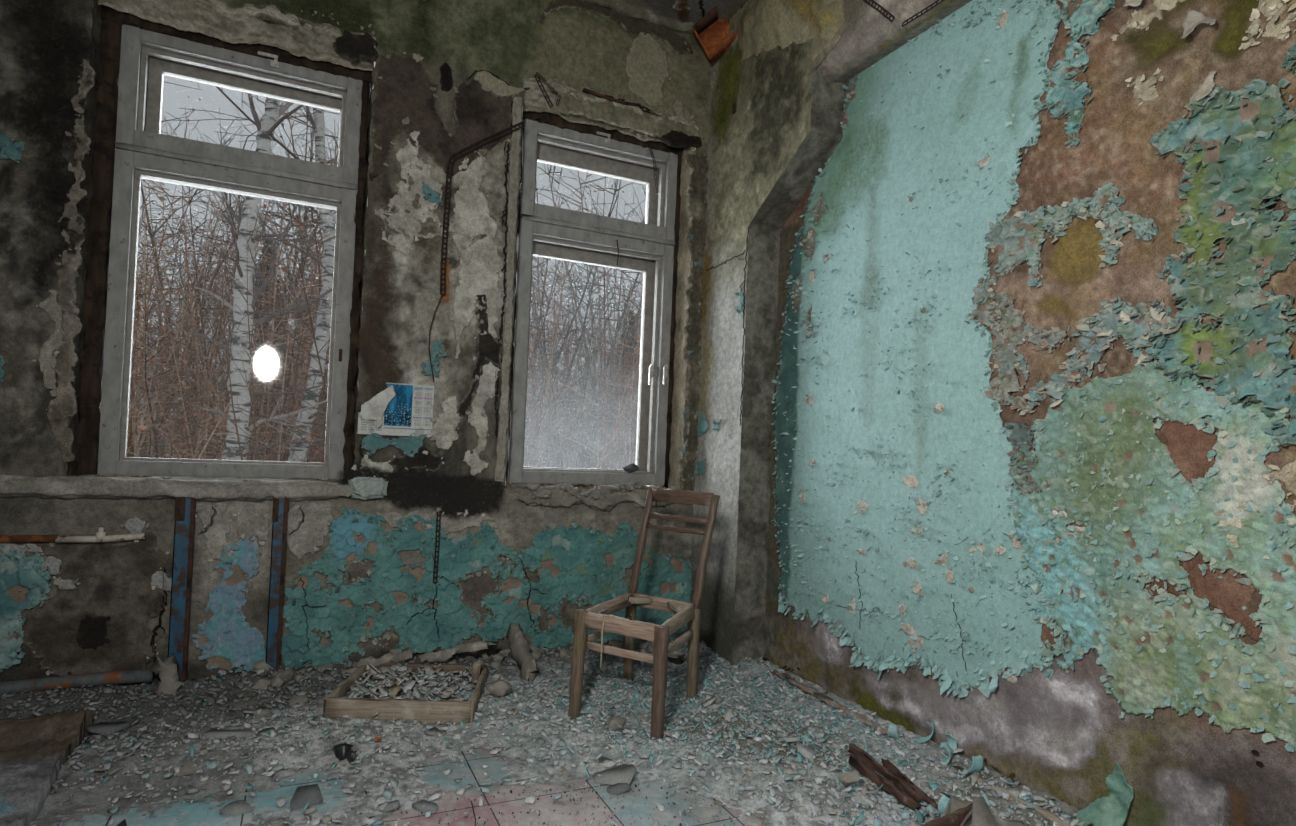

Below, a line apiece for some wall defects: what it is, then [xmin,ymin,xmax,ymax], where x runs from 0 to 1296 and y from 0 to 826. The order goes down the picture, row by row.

water stain [748,41,803,175]
spalling [32,59,95,463]
spalling [98,0,722,491]
peeling [771,0,1296,752]
spalling [0,516,172,685]
crack [300,578,326,649]
crack [406,554,459,638]
peeling [192,501,694,675]
efflorescence [872,671,1098,768]
peeling [909,758,1134,826]
water stain [1150,758,1290,826]